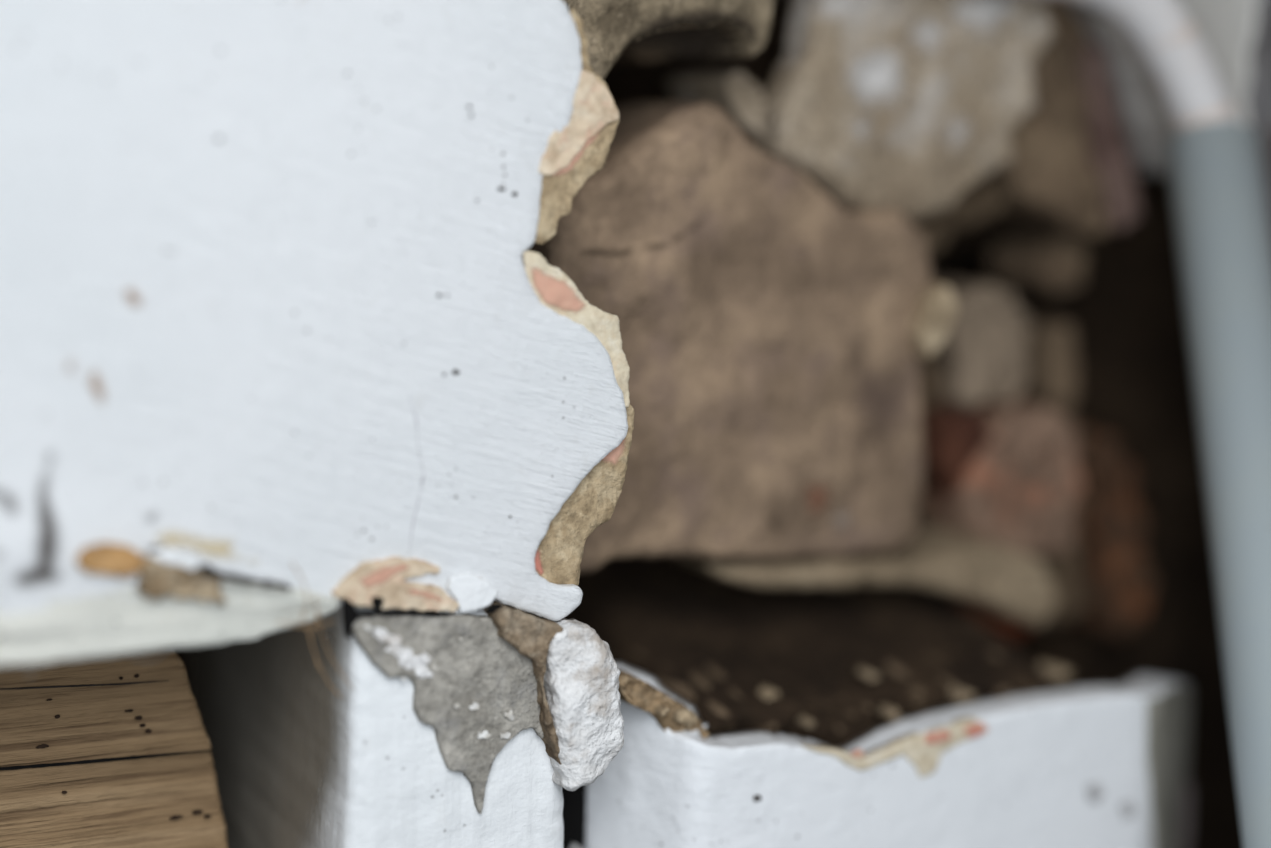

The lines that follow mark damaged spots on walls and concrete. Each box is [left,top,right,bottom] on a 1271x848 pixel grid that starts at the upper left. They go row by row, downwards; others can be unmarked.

spalling [331,0,1243,848]
peeling [1178,0,1258,126]